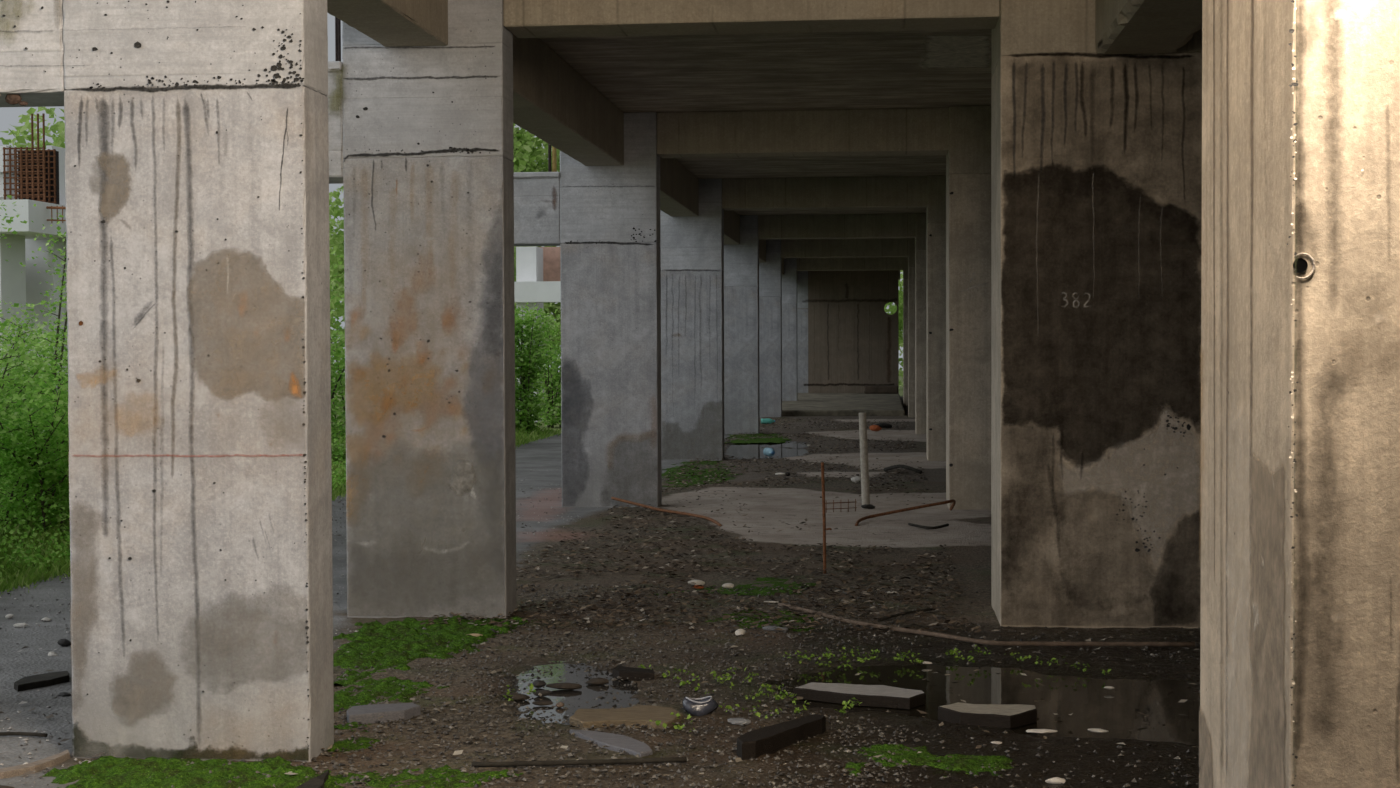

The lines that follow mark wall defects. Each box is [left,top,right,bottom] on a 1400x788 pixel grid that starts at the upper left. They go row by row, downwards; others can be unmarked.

water stain [93,101,133,297]
water stain [156,181,306,401]
water stain [1001,0,1228,788]